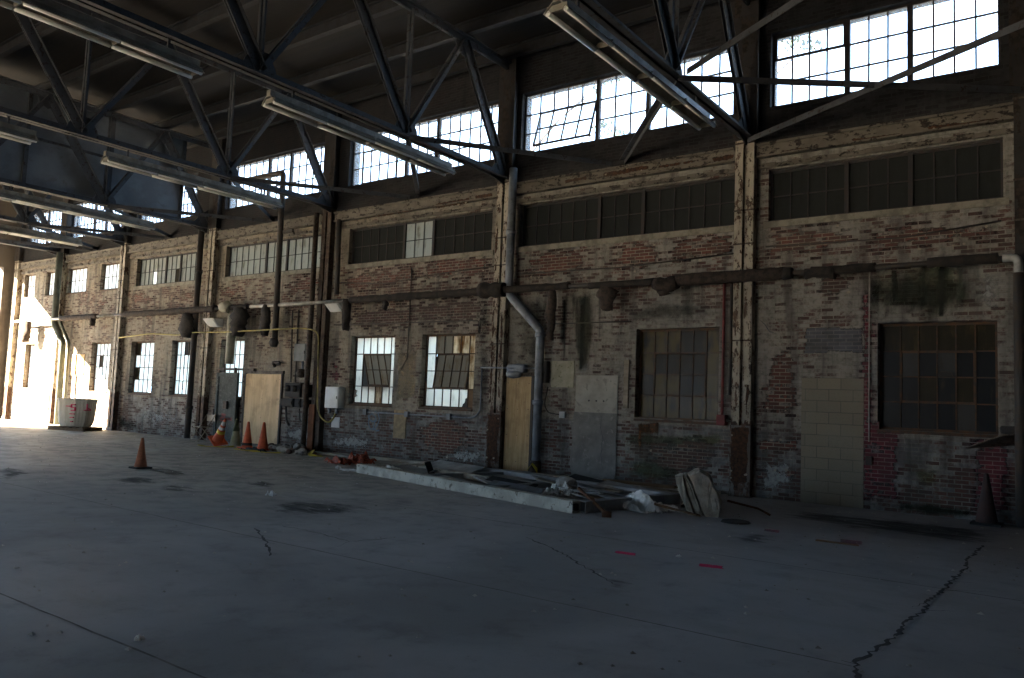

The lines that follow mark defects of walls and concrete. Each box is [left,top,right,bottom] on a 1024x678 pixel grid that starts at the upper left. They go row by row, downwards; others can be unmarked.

water stain [562,295,600,369]
peeling [759,347,798,417]
crack [841,545,986,678]